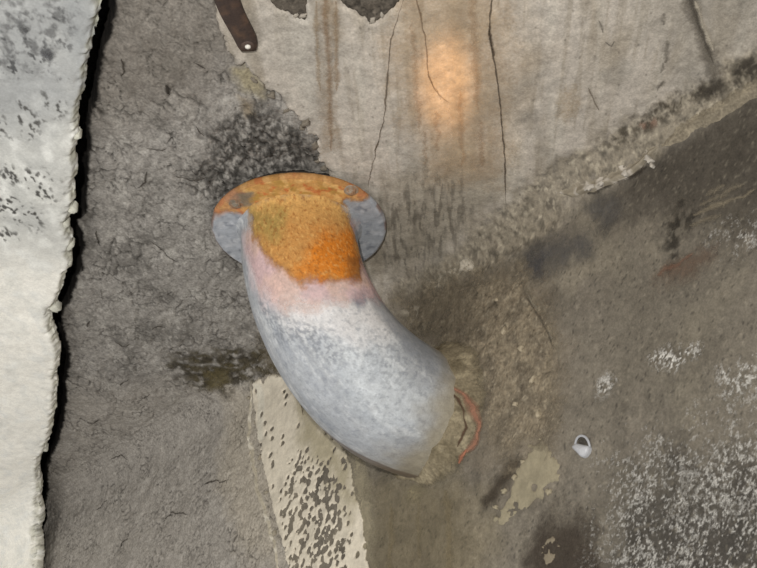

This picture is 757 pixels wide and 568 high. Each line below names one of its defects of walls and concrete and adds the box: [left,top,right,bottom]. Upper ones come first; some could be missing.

spalling [341,0,399,24]
water stain [200,111,318,199]
crack [368,2,441,184]
crack [489,0,506,202]
spalling [0,0,374,568]
water stain [652,344,699,369]
water stain [722,366,756,395]
water stain [610,435,757,568]